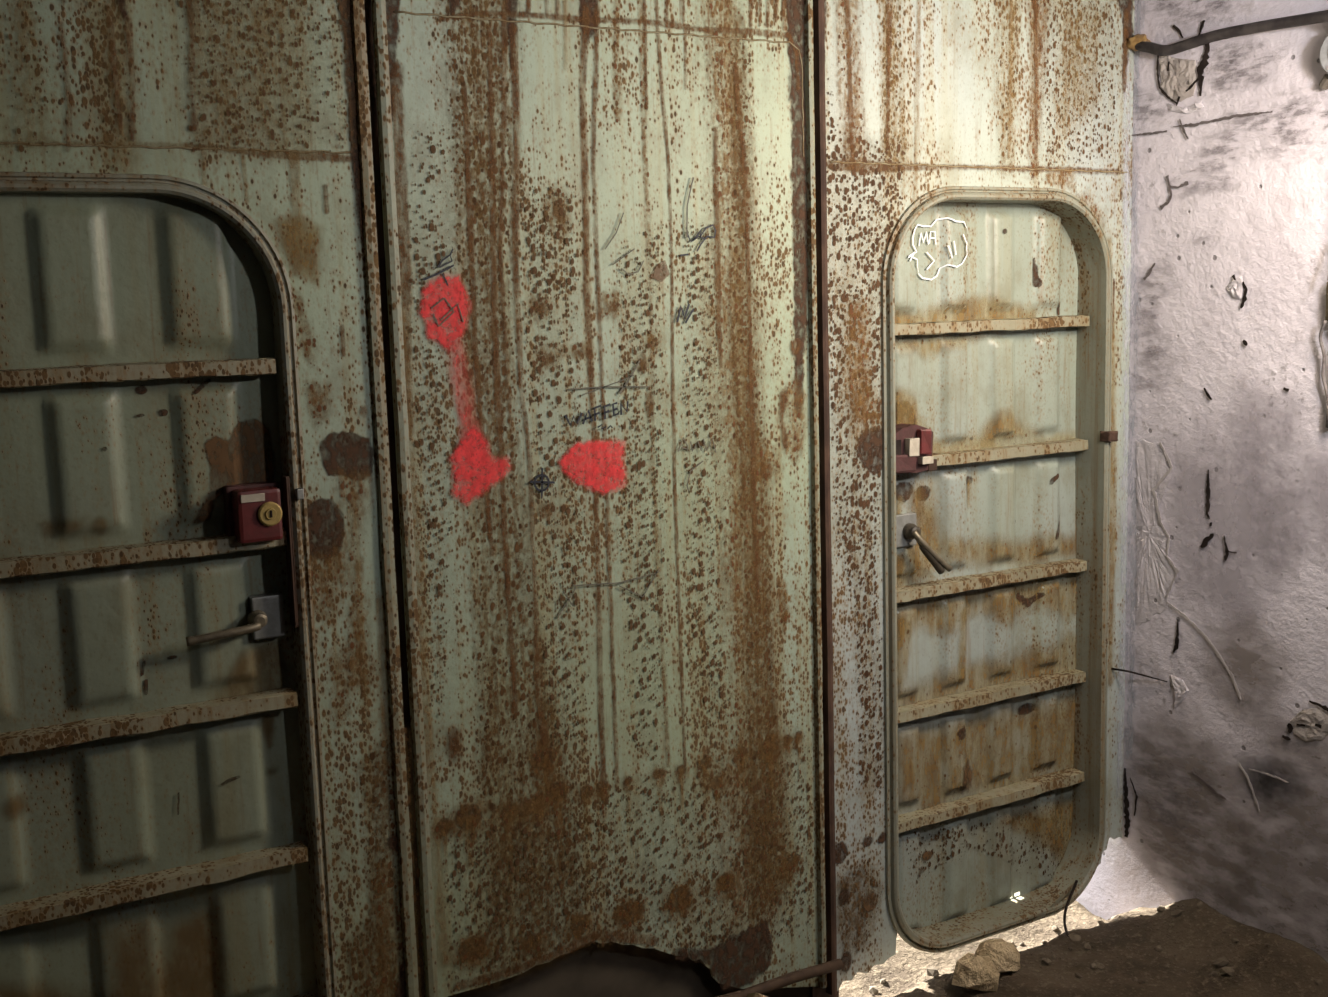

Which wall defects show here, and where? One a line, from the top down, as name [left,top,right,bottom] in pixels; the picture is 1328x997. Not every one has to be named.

rust [3,0,76,152]
rust [177,0,364,246]
flaking render [1156,20,1210,114]
rust [279,219,319,275]
rust [293,293,316,366]
rust [194,419,275,523]
rust [304,383,386,726]
rust [348,0,817,997]
crack [1200,470,1237,561]
crack [1167,601,1241,700]
flaking render [1282,700,1328,742]
rust [835,798,1073,971]